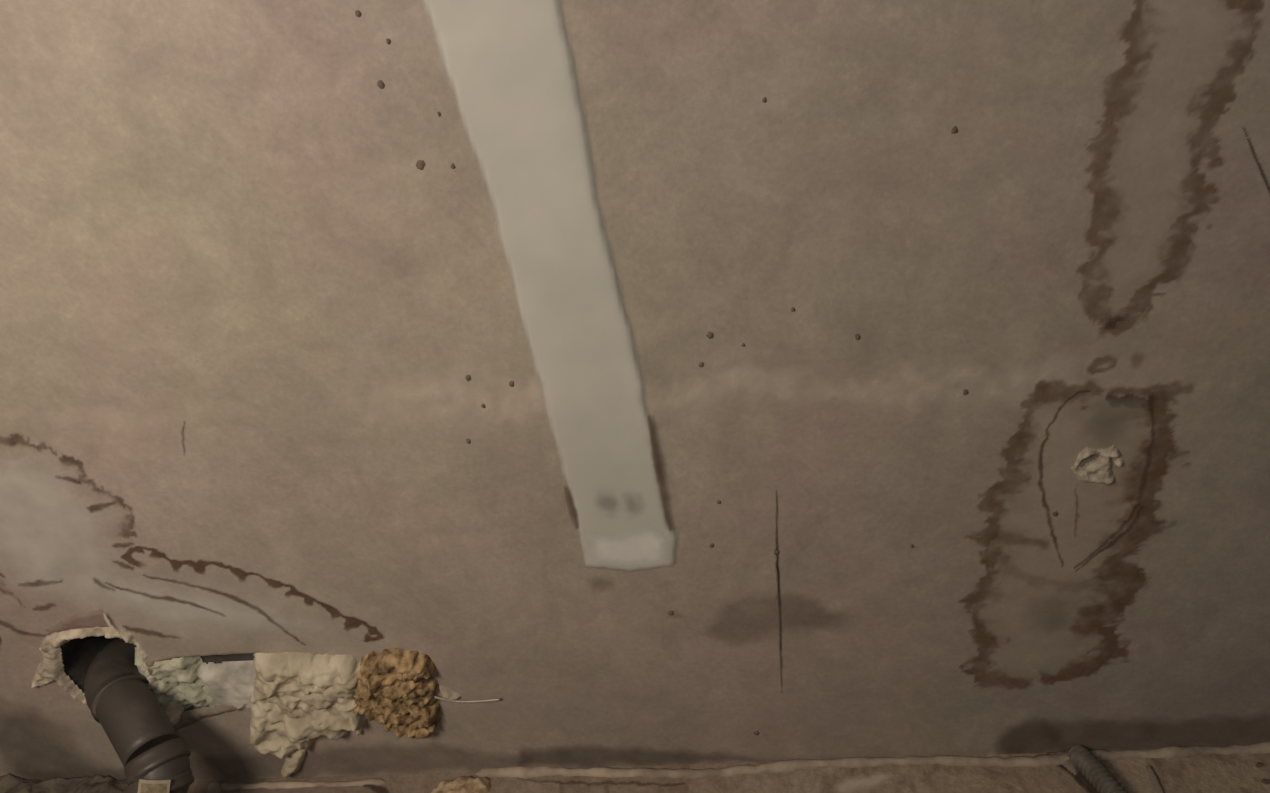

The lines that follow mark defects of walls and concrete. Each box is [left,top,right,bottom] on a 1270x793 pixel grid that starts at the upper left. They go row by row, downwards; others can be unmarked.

crack [1243,128,1270,190]
water stain [1139,163,1215,292]
water stain [60,456,125,511]
water stain [106,519,383,642]
crack [775,494,783,684]
water stain [961,481,1008,605]
water stain [1033,381,1131,508]
spalling [1070,444,1125,485]
water stain [1042,395,1175,684]
spalling [31,609,260,731]